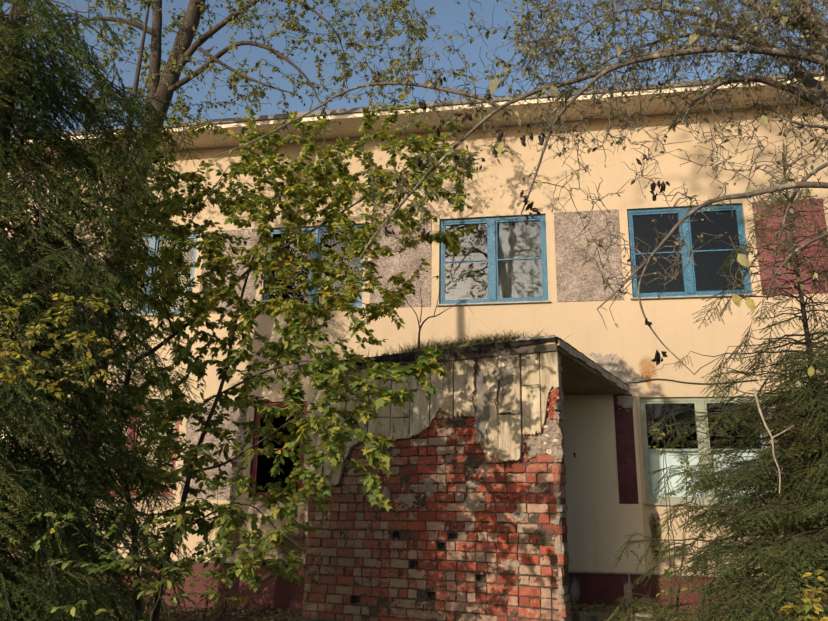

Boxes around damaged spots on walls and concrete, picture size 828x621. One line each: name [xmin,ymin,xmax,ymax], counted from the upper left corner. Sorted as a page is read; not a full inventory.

peeling [473,356,538,456]
flaking render [588,352,646,411]
spalling [524,356,572,621]
hole [437,532,458,550]